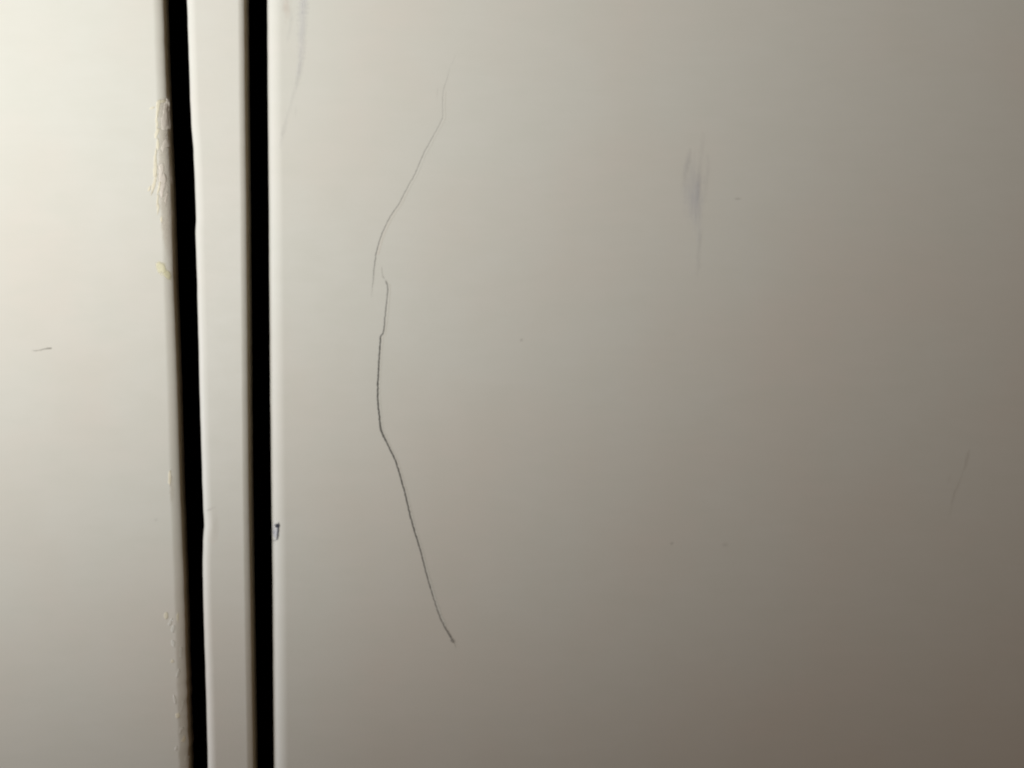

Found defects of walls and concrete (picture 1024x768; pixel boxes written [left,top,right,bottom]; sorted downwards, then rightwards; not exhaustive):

peeling [148,98,170,222]
crack [377,284,451,637]